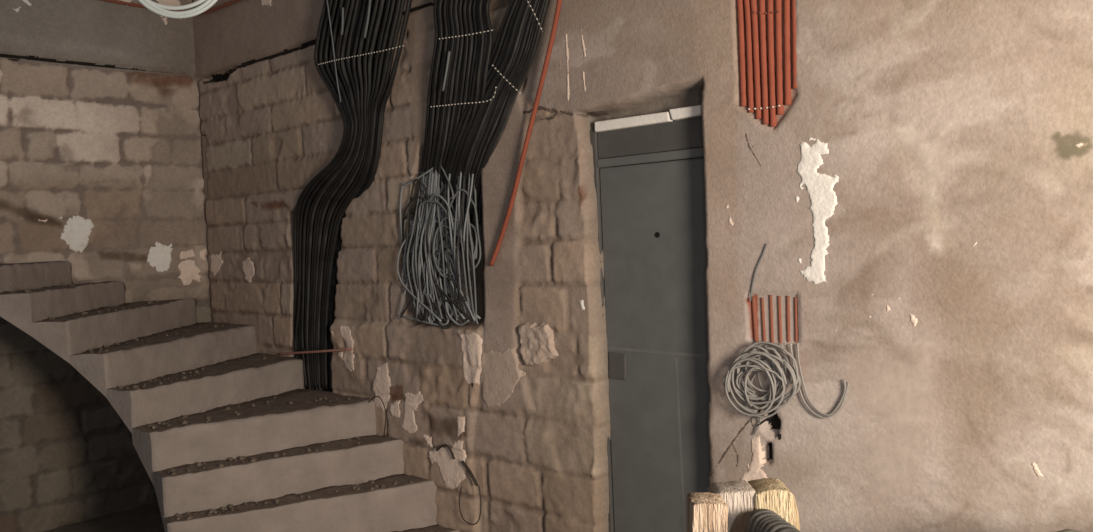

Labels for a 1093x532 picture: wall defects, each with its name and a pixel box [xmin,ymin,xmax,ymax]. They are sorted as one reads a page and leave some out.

crack [237,39,316,69]
water stain [1054,134,1090,157]
peeling [795,137,839,284]
peeling [390,400,401,418]
peeling [740,411,781,482]